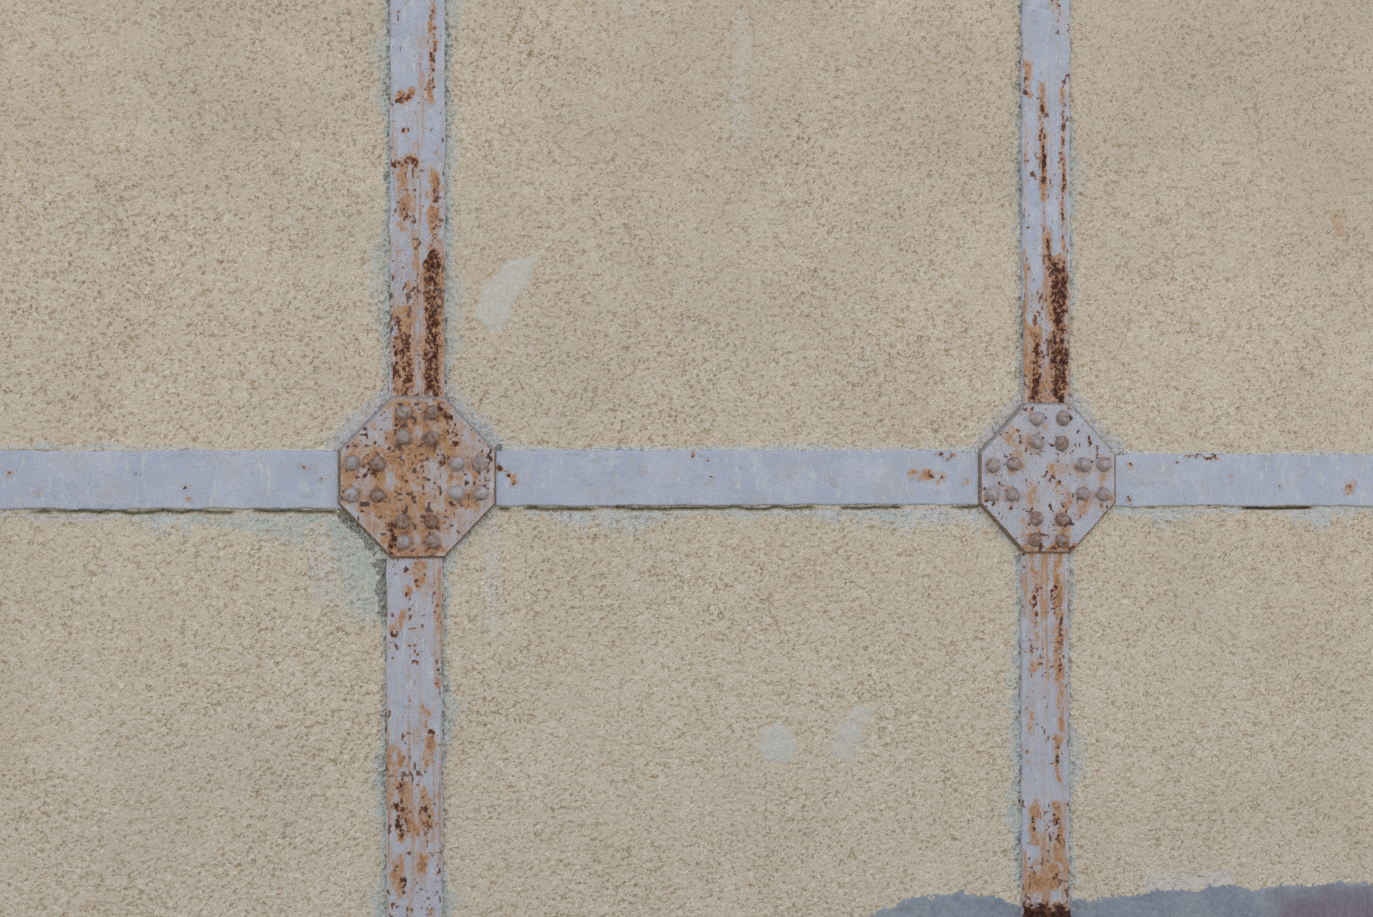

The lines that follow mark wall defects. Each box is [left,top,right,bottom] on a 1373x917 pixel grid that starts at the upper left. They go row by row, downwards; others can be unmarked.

rust [341,0,520,917]
rust [907,0,1135,917]